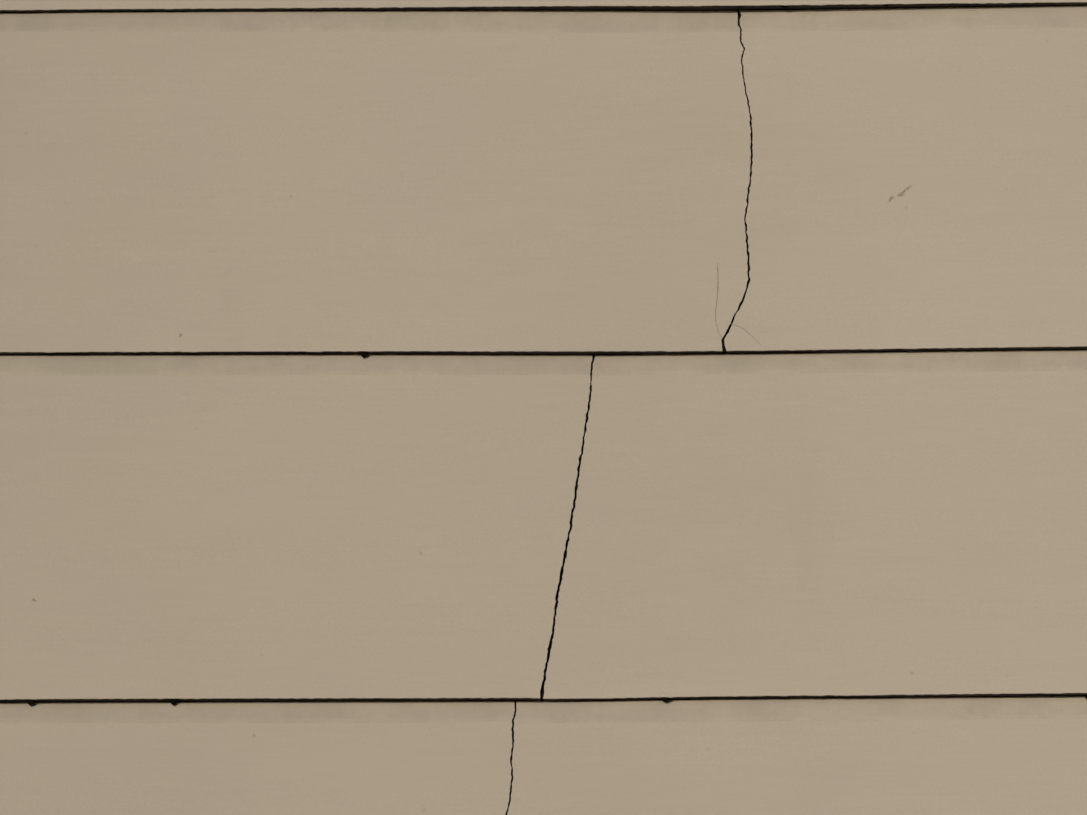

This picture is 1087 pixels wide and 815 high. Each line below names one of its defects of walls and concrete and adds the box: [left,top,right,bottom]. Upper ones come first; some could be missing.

crack [715,12,760,351]
crack [505,356,595,815]